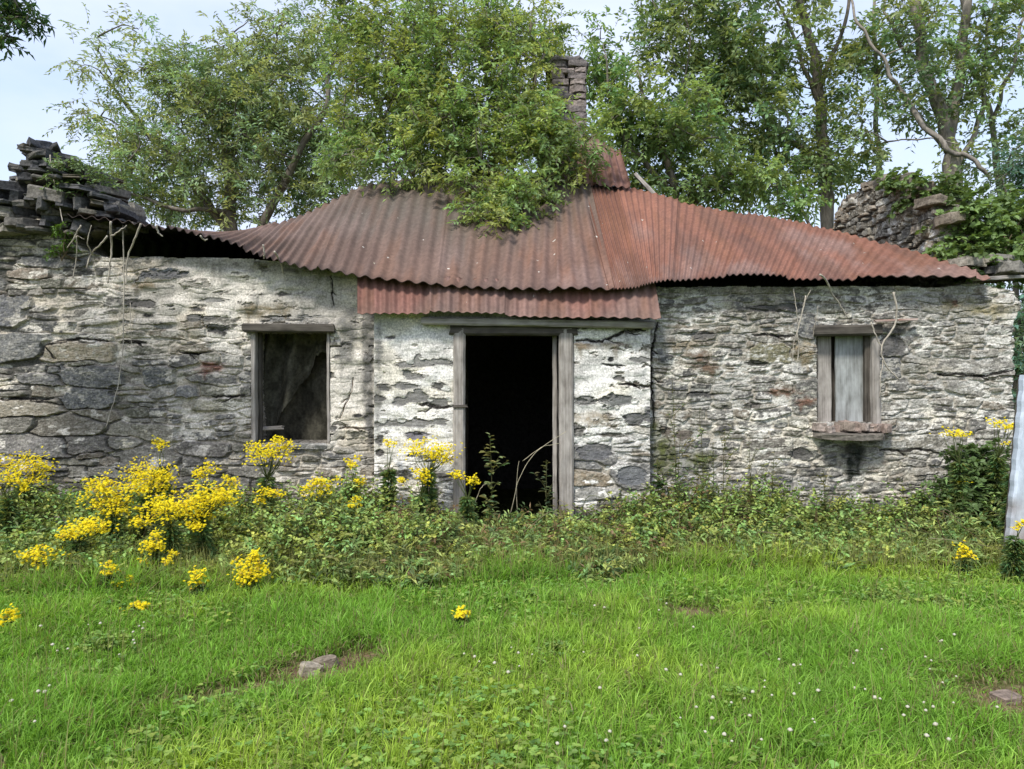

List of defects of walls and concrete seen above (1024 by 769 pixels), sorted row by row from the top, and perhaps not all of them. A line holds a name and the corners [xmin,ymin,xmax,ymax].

peeling [374,354,453,457]
peeling [575,394,693,460]
peeling [617,466,647,485]
water stain [846,444,865,479]